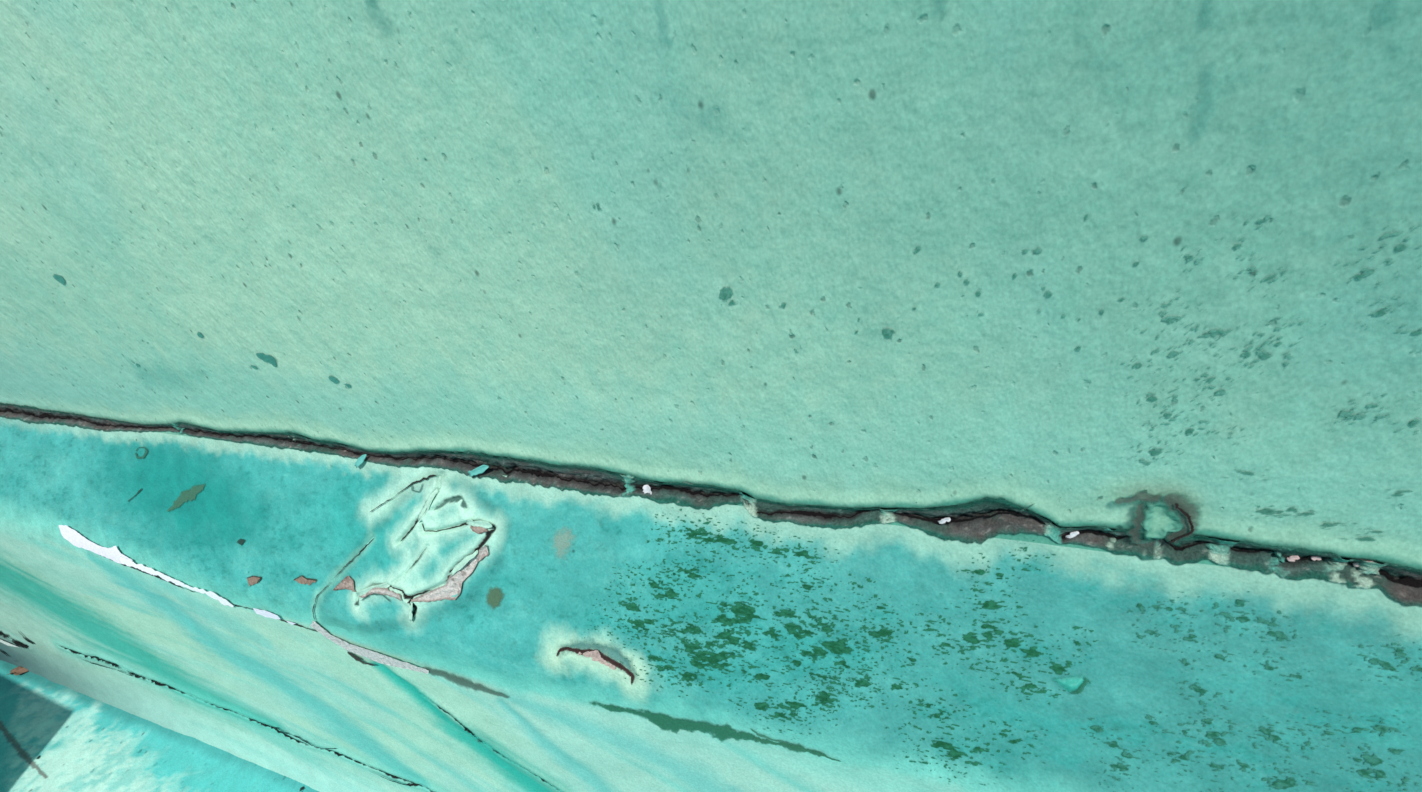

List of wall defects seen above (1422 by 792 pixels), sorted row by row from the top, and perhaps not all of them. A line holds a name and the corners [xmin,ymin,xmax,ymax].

peeling [59,465,509,698]
crack [0,403,1422,607]
crack [0,631,434,792]
crack [430,700,558,790]
crack [556,642,634,685]
damp [751,729,841,762]